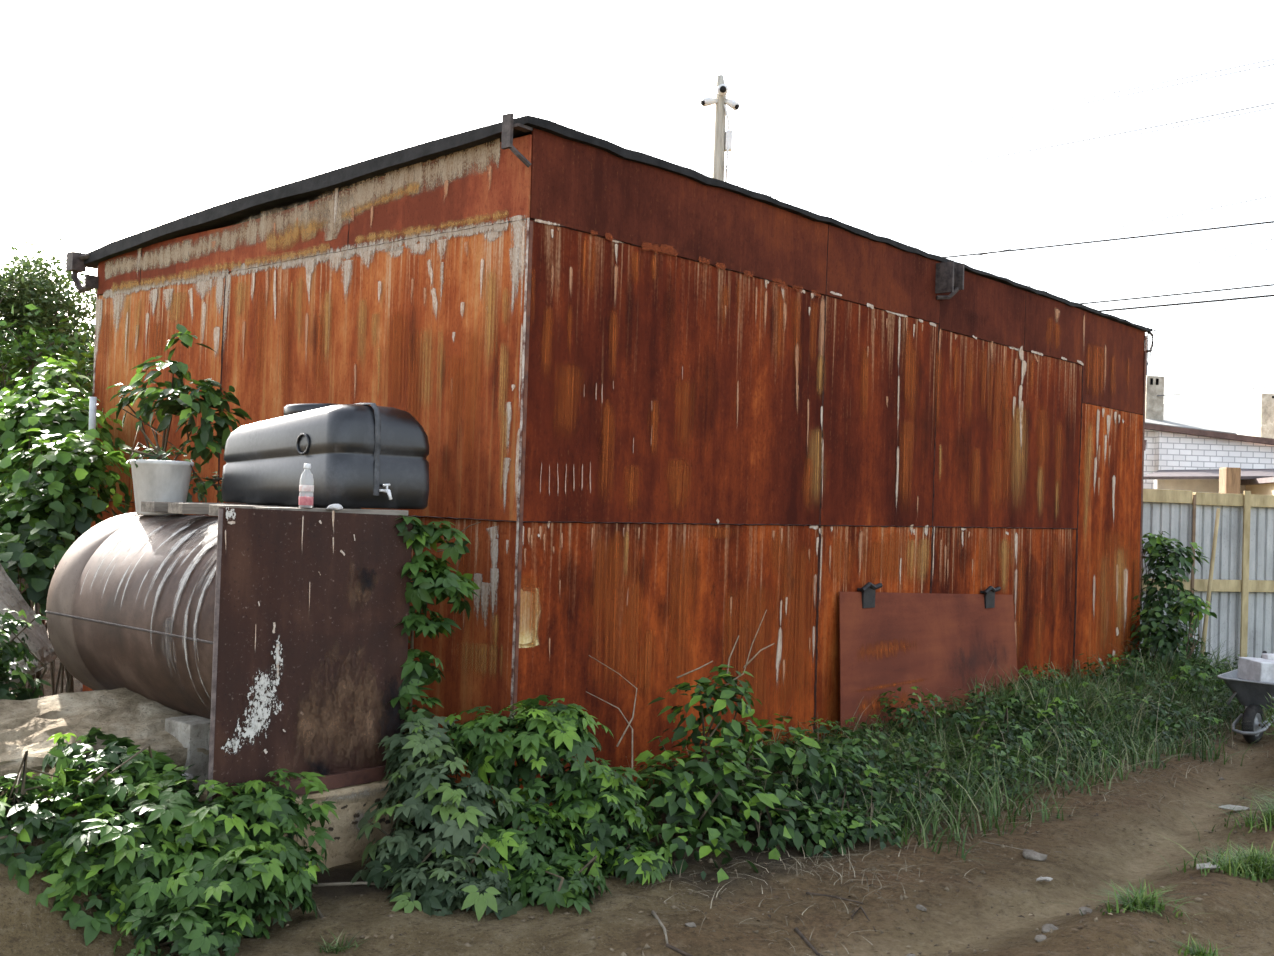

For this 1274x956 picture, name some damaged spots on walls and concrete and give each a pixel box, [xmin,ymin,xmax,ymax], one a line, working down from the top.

rust [236,270,329,380]
rust [354,259,506,445]
rust [570,239,595,291]
rust [756,280,825,500]
rust [937,329,1062,510]
rust [1083,316,1129,391]
rust [459,526,509,671]
rust [723,317,949,706]
rust [1002,532,1023,649]
rust [1085,433,1138,666]
peeling [221,622,284,754]
rust [297,676,401,776]